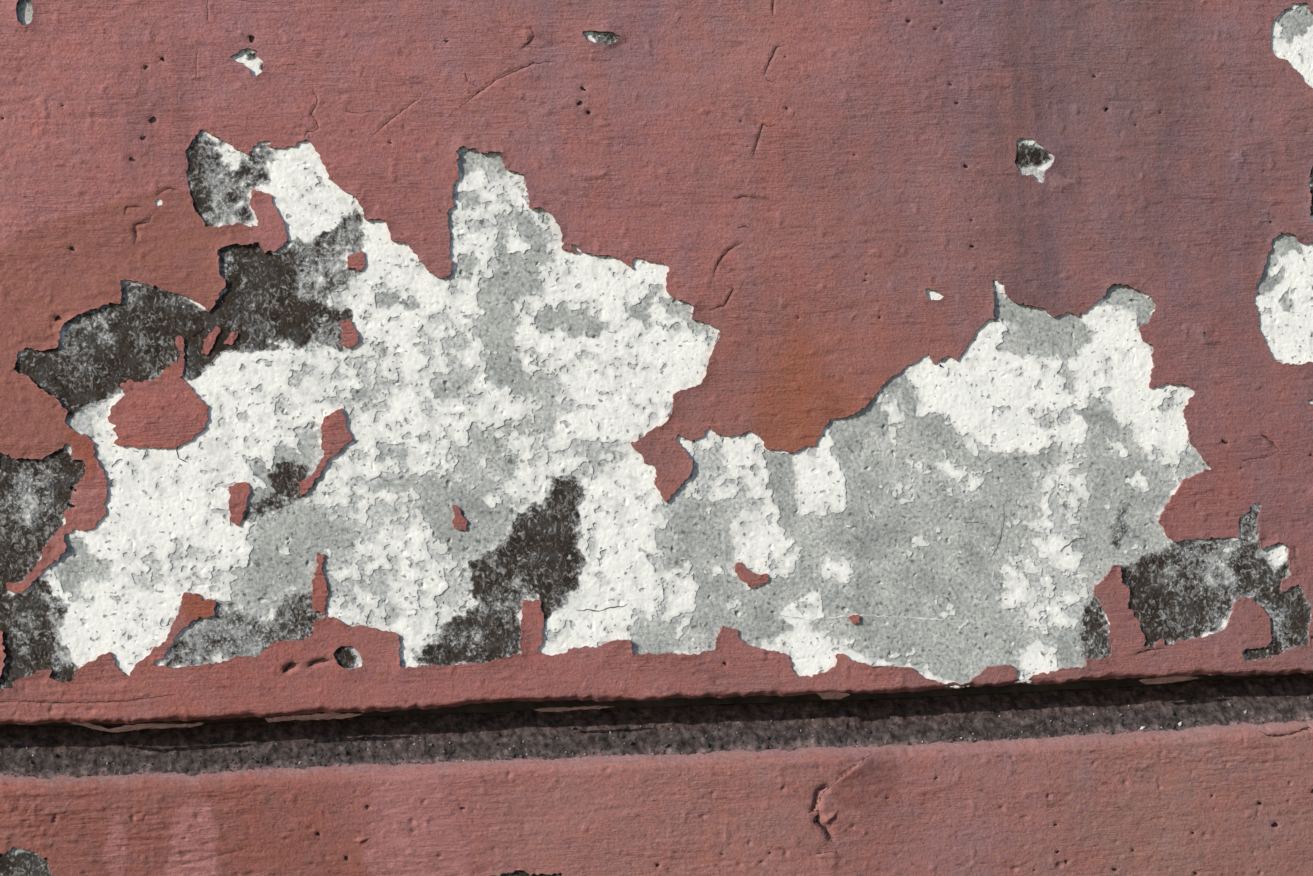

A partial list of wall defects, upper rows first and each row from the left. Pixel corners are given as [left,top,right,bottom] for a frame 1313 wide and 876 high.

peeling [1270,3,1313,88]
peeling [1254,221,1313,365]
peeling [6,130,1301,688]